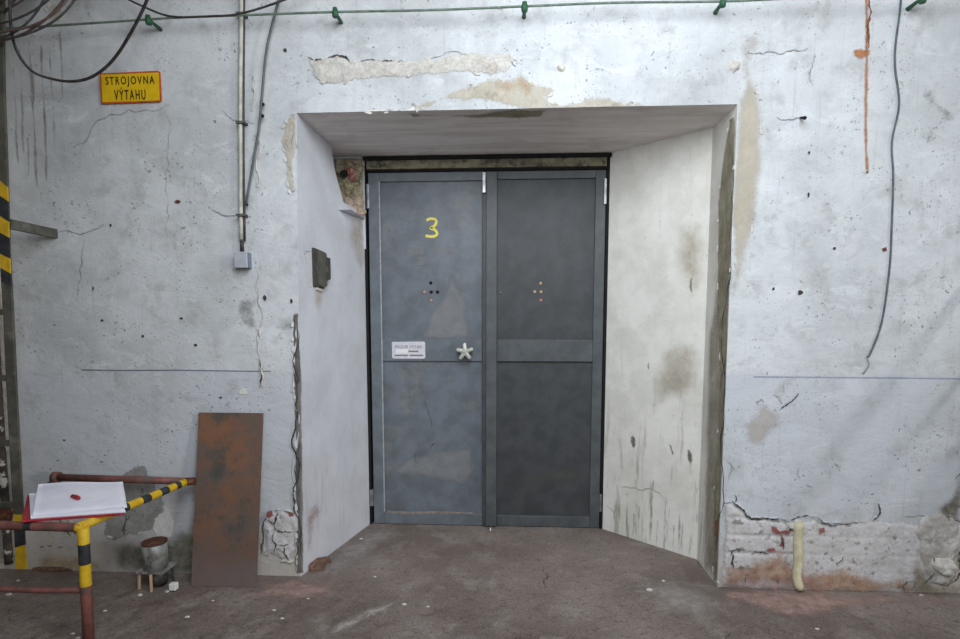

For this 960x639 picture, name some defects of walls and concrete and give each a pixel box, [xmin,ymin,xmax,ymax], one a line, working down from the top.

crack [72,106,172,238]
flaking render [308,51,640,118]
crack [256,271,264,388]
flaking render [260,314,331,573]
crack [291,318,302,574]
flaking render [712,87,925,592]